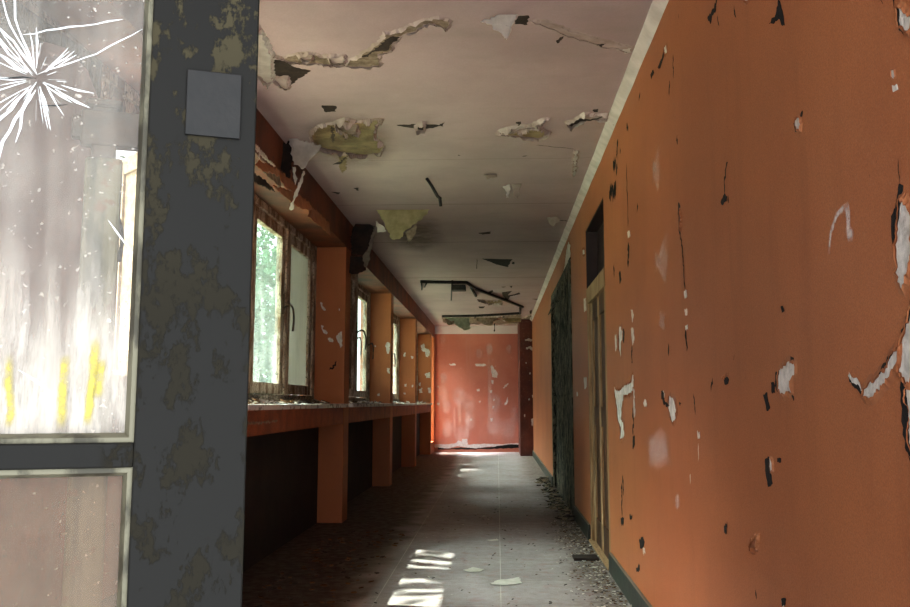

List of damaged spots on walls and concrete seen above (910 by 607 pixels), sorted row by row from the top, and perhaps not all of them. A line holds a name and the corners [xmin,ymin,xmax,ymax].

peeling [257,16,453,91]
peeling [480,14,635,54]
peeling [769,0,785,26]
peeling [895,0,910,39]
peeling [397,121,444,135]
peeling [494,117,553,142]
peeling [564,109,609,132]
peeling [254,105,386,235]
peeling [349,209,430,274]
peeling [848,162,910,460]
peeling [614,372,647,448]
peeling [661,391,681,426]